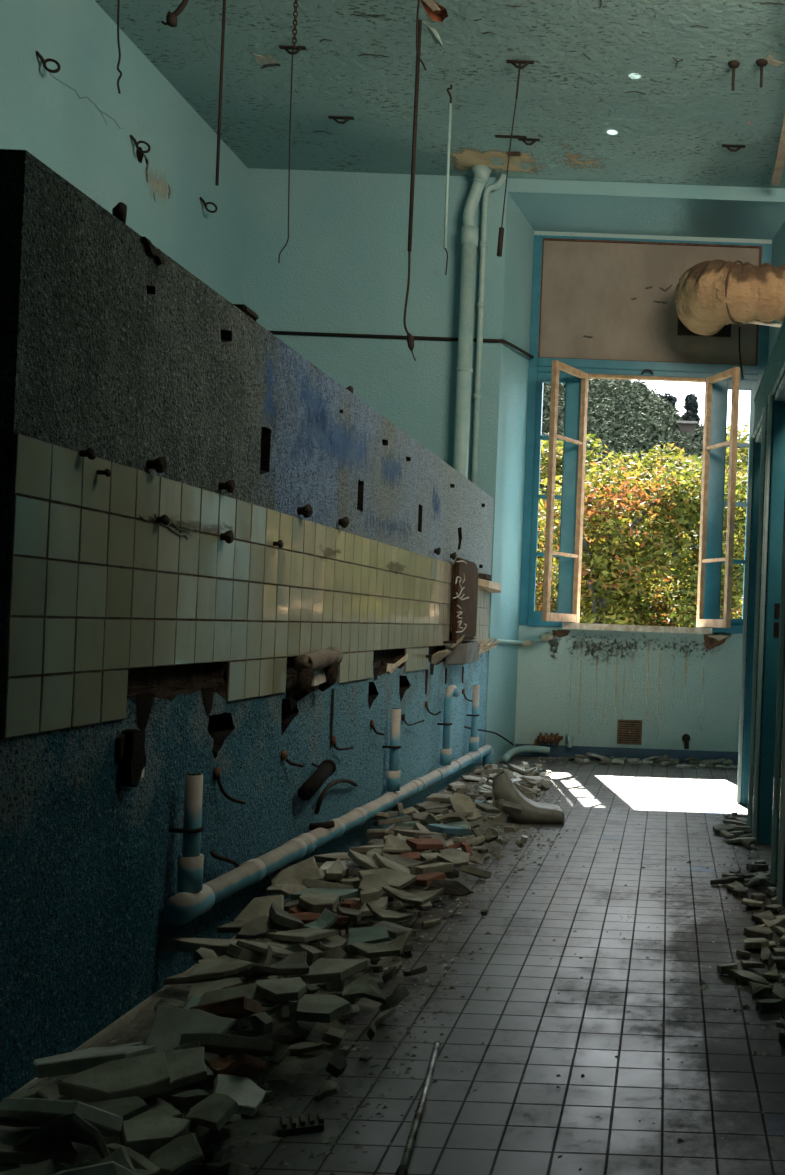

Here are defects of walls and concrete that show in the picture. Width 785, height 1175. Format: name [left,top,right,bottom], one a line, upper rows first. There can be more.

peeling [451,144,609,174]
spalling [127,662,235,759]
spalling [281,656,320,735]
spalling [368,648,411,709]
spalling [428,645,445,675]
leakage [566,633,708,664]